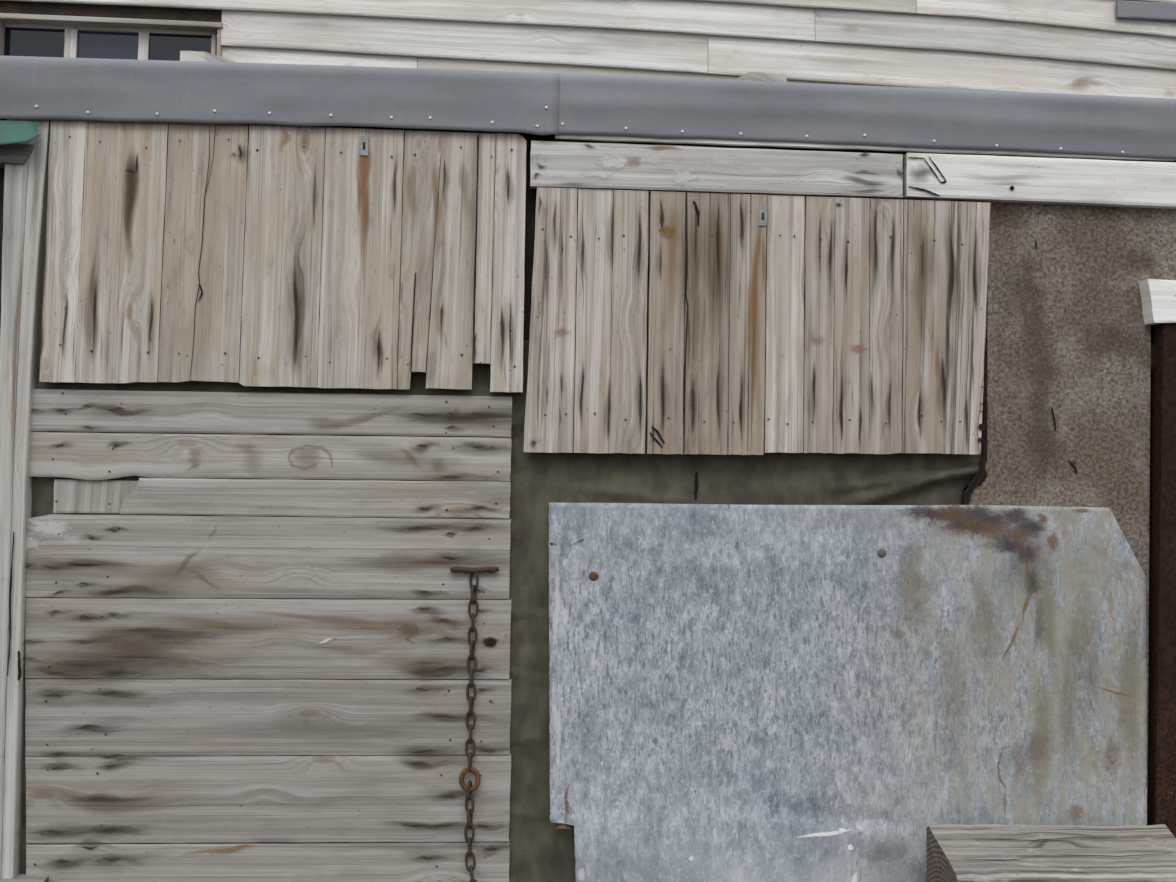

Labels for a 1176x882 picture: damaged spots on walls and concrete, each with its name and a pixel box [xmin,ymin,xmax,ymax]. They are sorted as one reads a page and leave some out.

crack [189,125,216,382]
rust [928,505,1057,549]
rust [1006,559,1039,652]